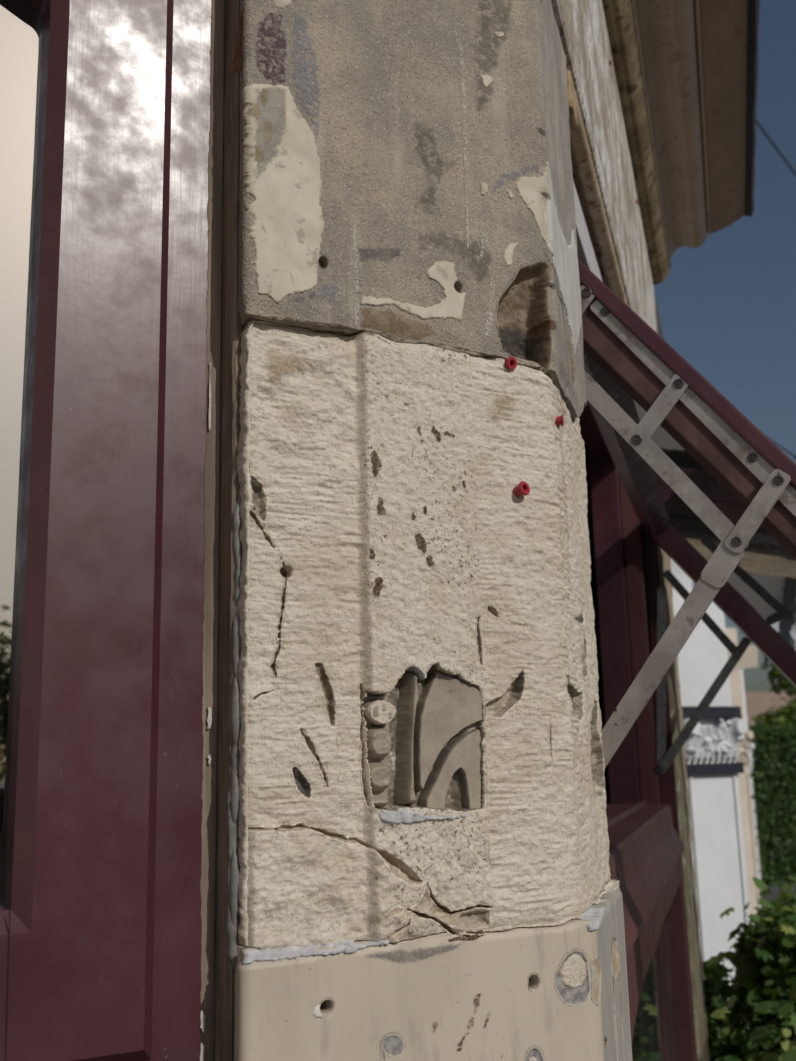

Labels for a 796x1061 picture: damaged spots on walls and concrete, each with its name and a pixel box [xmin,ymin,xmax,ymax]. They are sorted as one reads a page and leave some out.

water stain [474,0,511,110]
peeling [360,261,466,321]
spalling [495,242,554,374]
crack [247,503,289,702]
spalling [566,610,605,799]